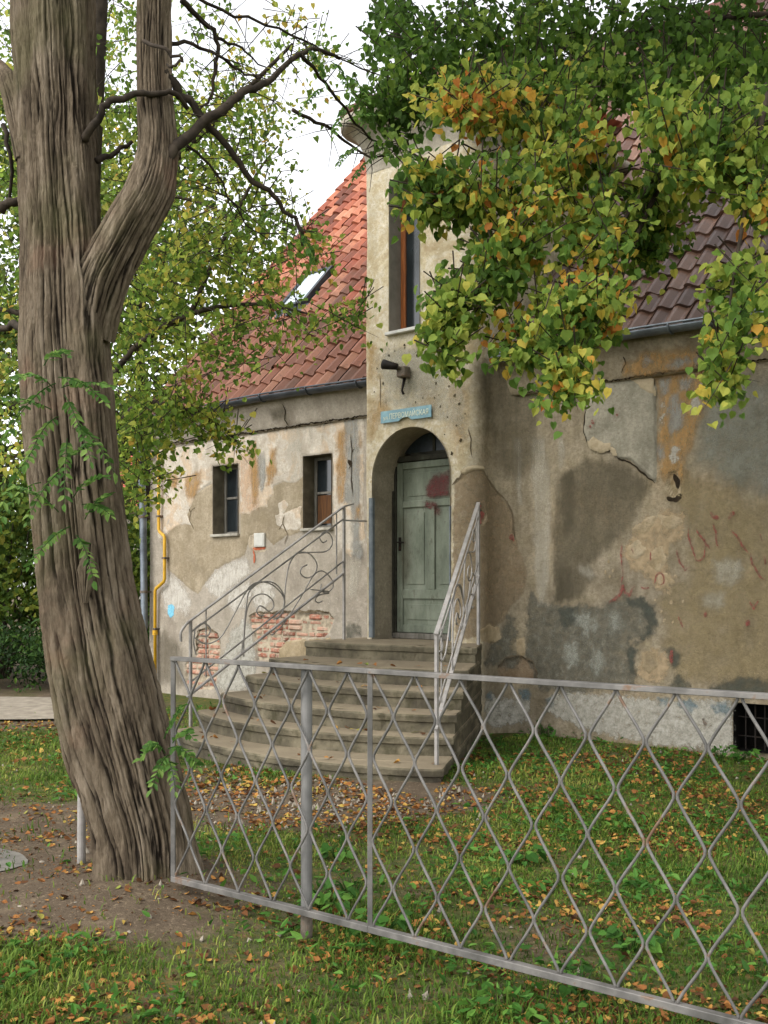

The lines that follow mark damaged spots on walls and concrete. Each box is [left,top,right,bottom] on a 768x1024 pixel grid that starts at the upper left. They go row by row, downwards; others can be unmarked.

flaking render [185,626,221,690]
flaking render [156,418,365,594]
crack [175,379,381,493]
flaking render [249,610,334,662]
water stain [484,465,768,693]
flaking render [583,377,685,624]